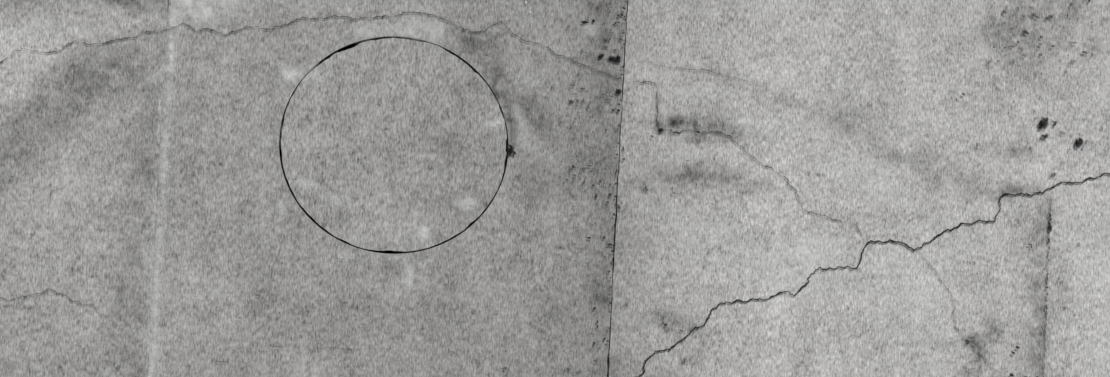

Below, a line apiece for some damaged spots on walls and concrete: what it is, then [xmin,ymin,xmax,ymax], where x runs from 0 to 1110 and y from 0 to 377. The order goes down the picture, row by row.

crack [0,12,585,66]
crack [611,75,1110,377]